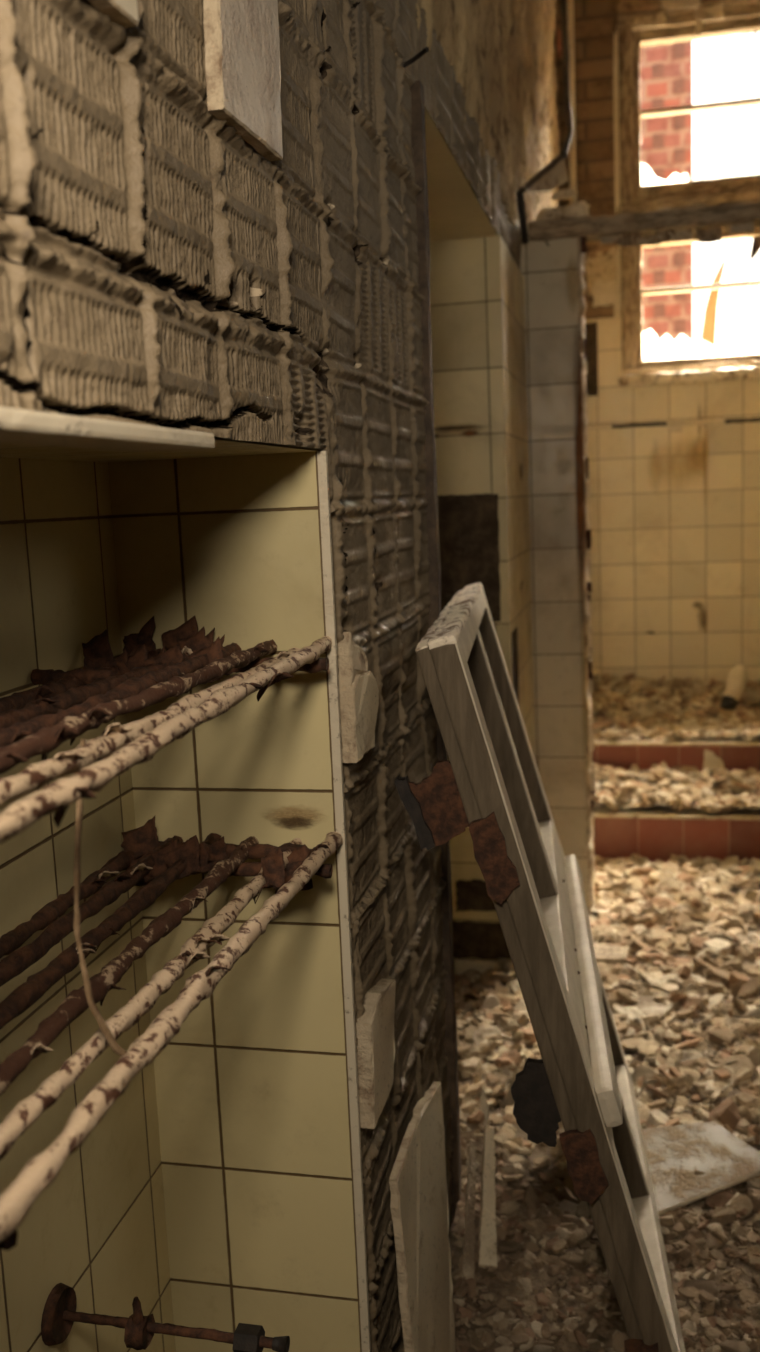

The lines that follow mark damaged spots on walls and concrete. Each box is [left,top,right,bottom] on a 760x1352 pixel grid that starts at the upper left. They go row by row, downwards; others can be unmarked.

crack [0,125,306,442]